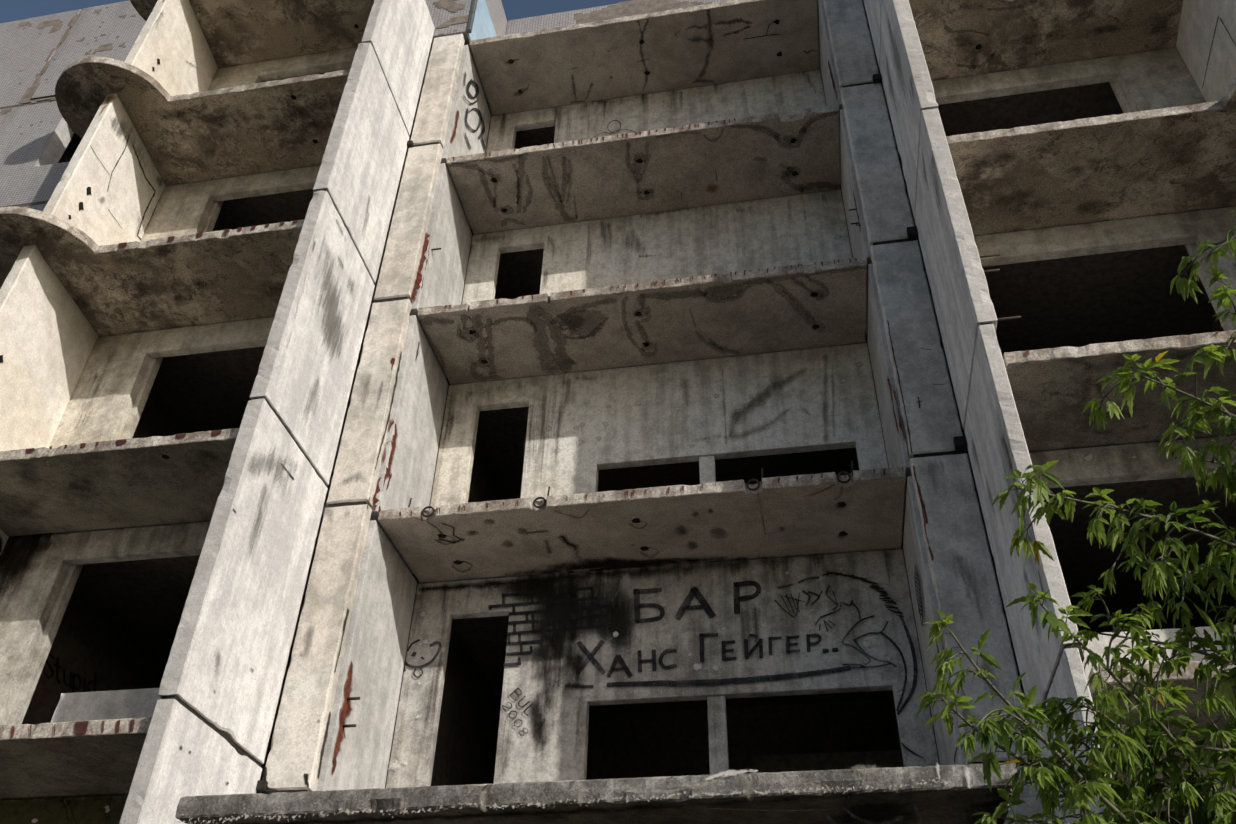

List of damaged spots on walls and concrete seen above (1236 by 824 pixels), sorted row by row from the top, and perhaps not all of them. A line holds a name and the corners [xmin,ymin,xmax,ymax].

peeling [0,9,126,115]
peeling [433,0,469,29]
peeling [574,0,712,24]
crack [90,139,159,240]
rust [887,379,934,561]
leakage [416,528,746,746]
rust [318,661,353,779]